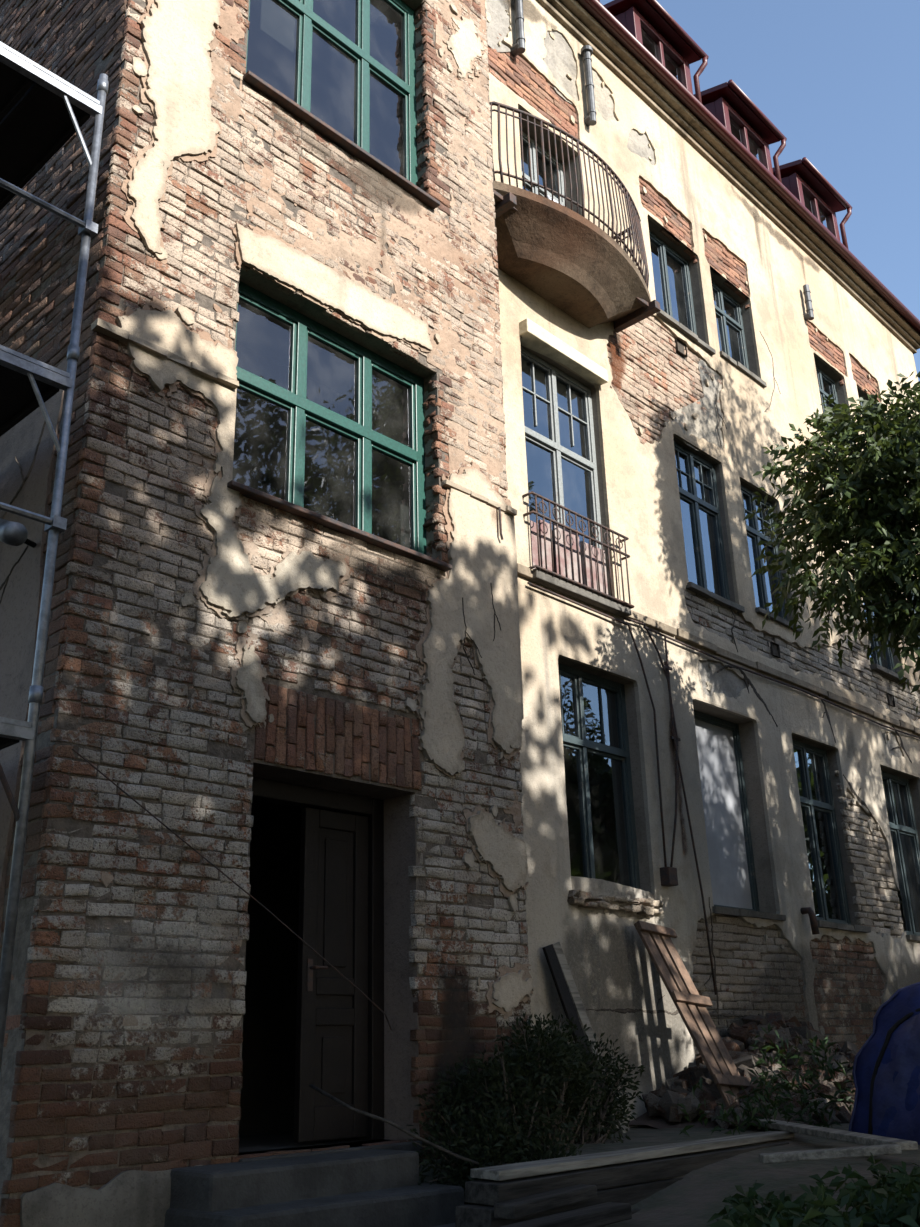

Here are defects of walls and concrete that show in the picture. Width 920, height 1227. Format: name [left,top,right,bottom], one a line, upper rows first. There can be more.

flaking render [120,0,223,265]
flaking render [232,223,441,353]
flaking render [607,316,724,452]
flaking render [115,296,350,728]
flaking render [405,461,524,777]
flaking render [684,589,920,721]
flaking render [462,804,529,912]
flaking render [571,876,654,920]
flaking render [691,770,904,1049]
flaking render [475,962,535,1019]